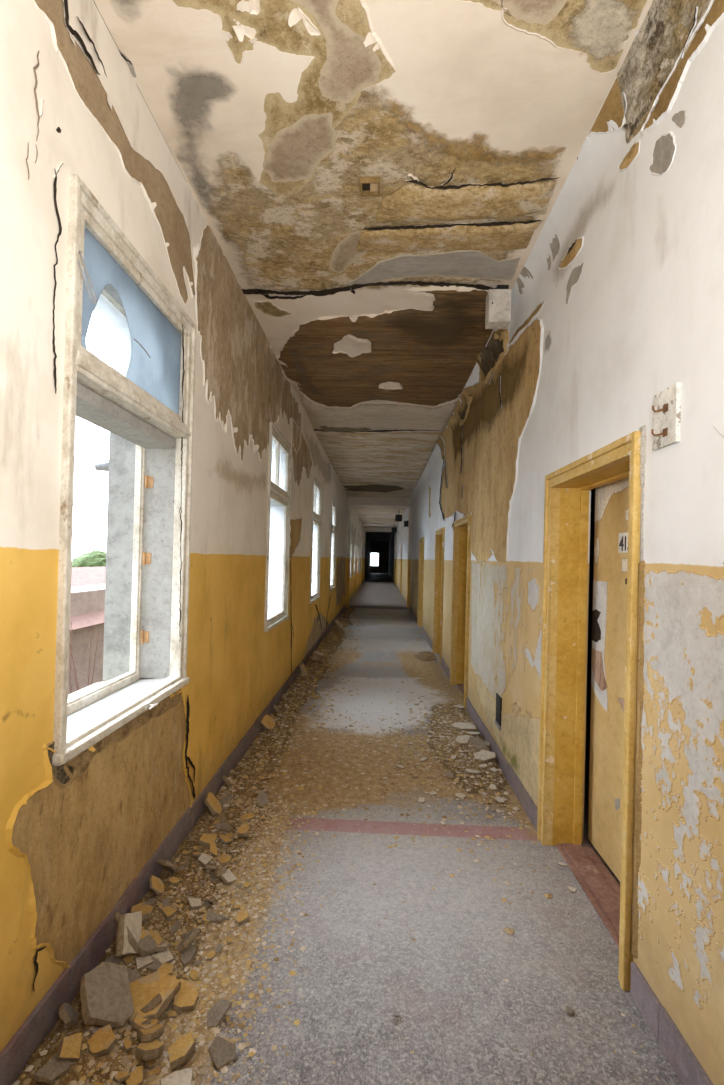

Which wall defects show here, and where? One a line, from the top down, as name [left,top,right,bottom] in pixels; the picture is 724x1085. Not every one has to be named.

crack [26,51,63,394]
crack [64,0,187,182]
water stain [175,74,232,146]
water stain [185,91,553,292]
crack [242,281,496,299]
crack [362,218,541,231]
crack [405,167,559,190]
peeling [455,0,724,176]
water stain [573,0,637,59]
flaking render [33,0,550,808]
peeling [595,425,724,1010]
flaking render [5,689,193,969]